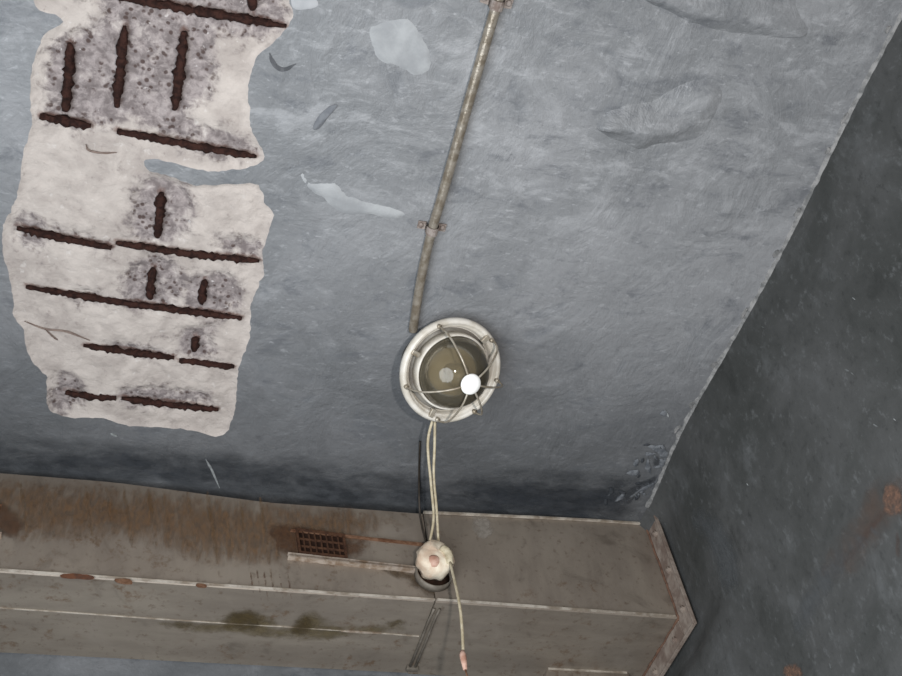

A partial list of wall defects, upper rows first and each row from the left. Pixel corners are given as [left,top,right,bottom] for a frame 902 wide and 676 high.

peeling [370,19,431,75]
peeling [301,173,405,218]
spalling [2,0,318,437]
rust [0,506,21,535]
water stain [204,613,271,634]
water stain [293,617,340,638]